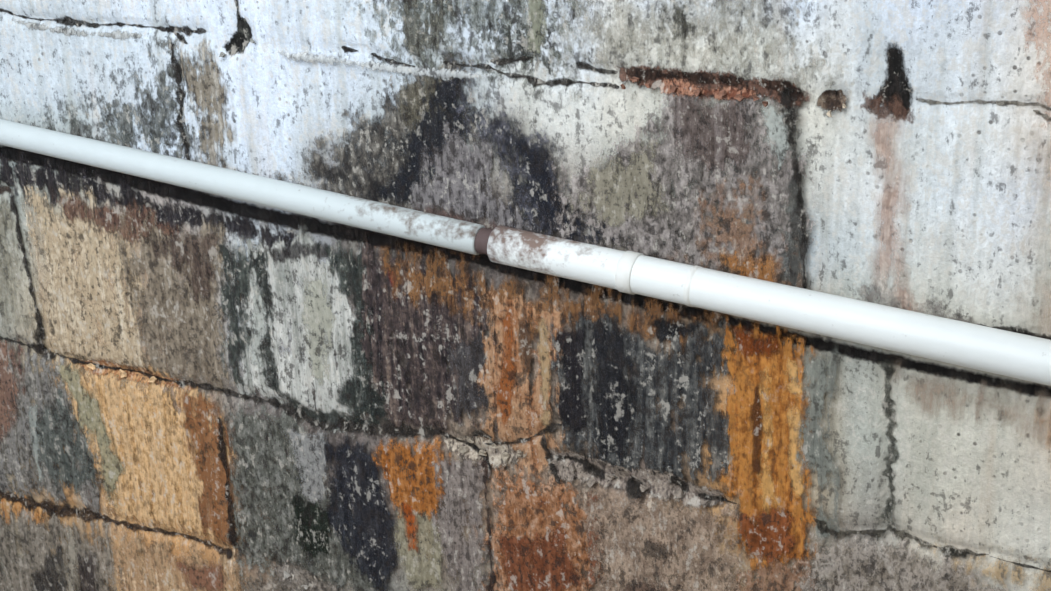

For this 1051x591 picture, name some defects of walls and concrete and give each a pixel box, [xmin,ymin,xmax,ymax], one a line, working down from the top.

crack [0,8,206,160]
water stain [45,36,233,168]
crack [341,46,619,89]
water stain [274,0,814,288]
water stain [861,44,913,123]
rust [698,178,791,286]
rust [0,492,61,525]
crack [0,186,642,591]
spalling [444,436,527,469]
water stain [0,146,1051,591]
rust [373,247,817,591]
spalling [548,448,727,507]